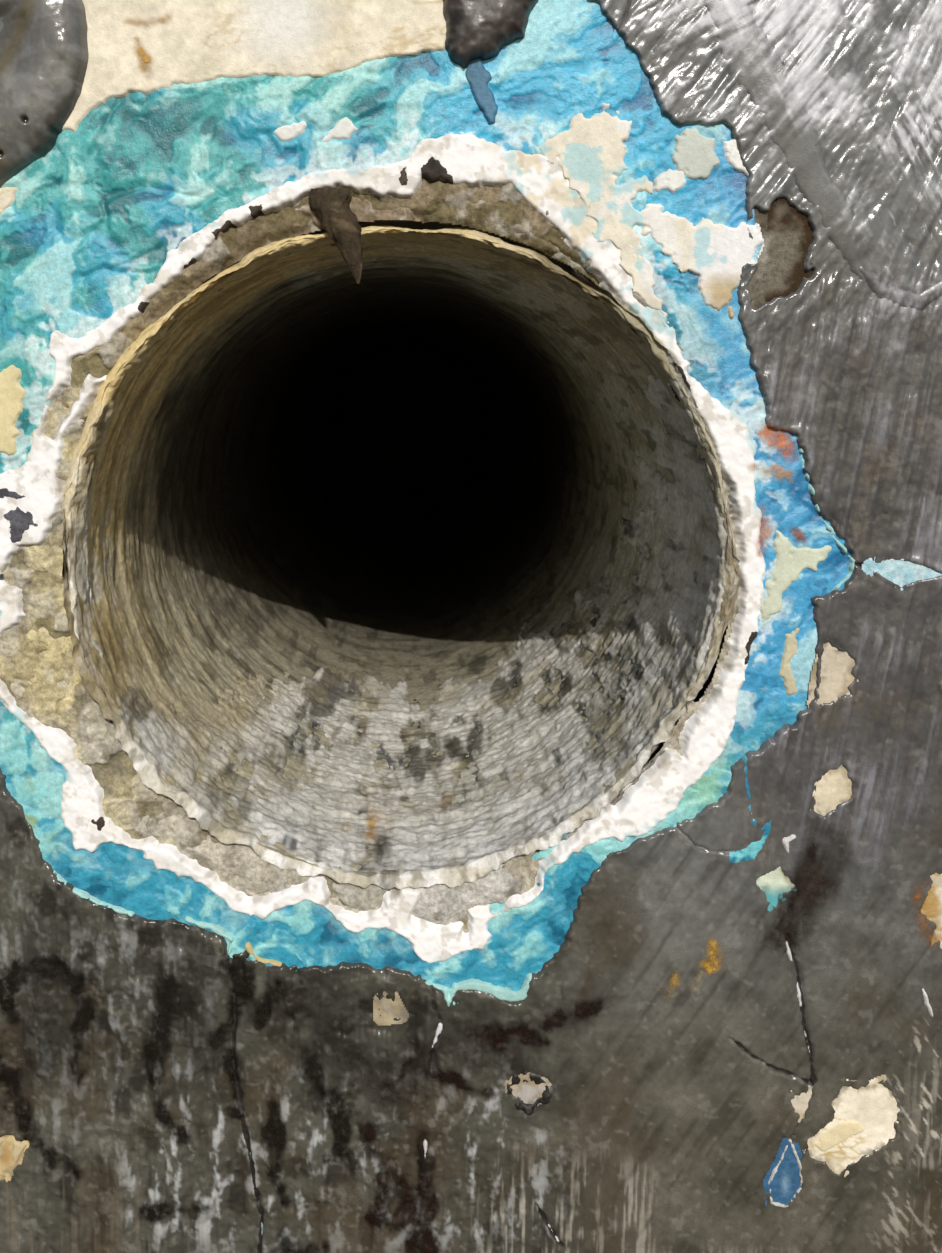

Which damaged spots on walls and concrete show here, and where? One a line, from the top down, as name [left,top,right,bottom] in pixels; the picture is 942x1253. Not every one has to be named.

peeling [0,0,859,1006]
peeling [862,556,942,591]
peeling [921,873,942,949]
crack [732,934,817,1086]
crack [228,955,265,1253]
peeling [763,1075,900,1207]